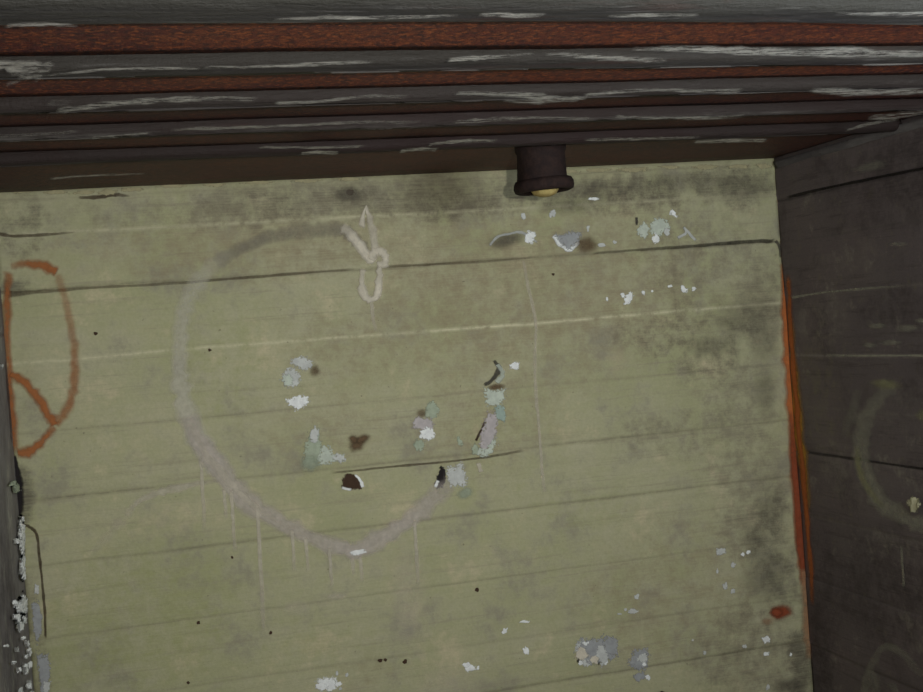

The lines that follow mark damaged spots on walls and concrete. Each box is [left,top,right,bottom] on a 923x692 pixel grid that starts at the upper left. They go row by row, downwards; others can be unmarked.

peeling [552,226,617,252]
peeling [635,209,696,244]
peeling [279,355,318,412]
peeling [302,426,368,469]
spalling [341,473,364,491]
peeling [411,401,440,451]
spalling [434,461,470,497]
peeling [457,360,520,472]
rust [782,270,813,648]
peeling [13,516,26,581]
peeling [3,584,51,692]